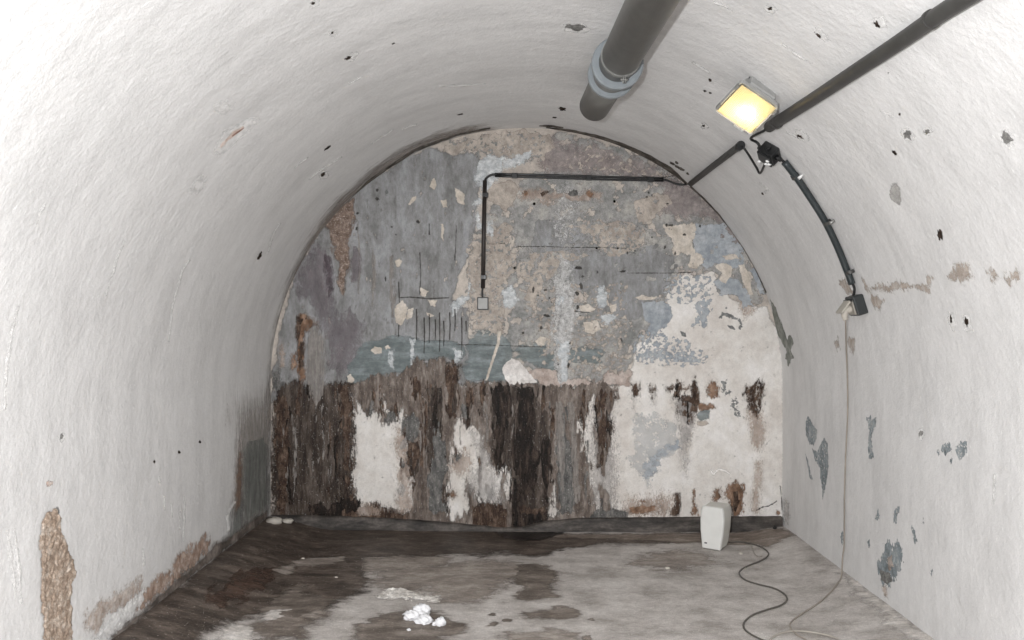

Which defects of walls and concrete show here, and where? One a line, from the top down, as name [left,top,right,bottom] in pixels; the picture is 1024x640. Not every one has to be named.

spalling [563,24,591,33]
spalling [890,183,901,205]
peeling [271,128,794,521]
leakage [95,127,738,640]
leakage [742,377,767,448]
peeling [805,417,828,499]
peeling [866,416,876,459]
peeling [937,441,967,463]
spalling [39,507,77,640]
peeling [877,539,904,587]